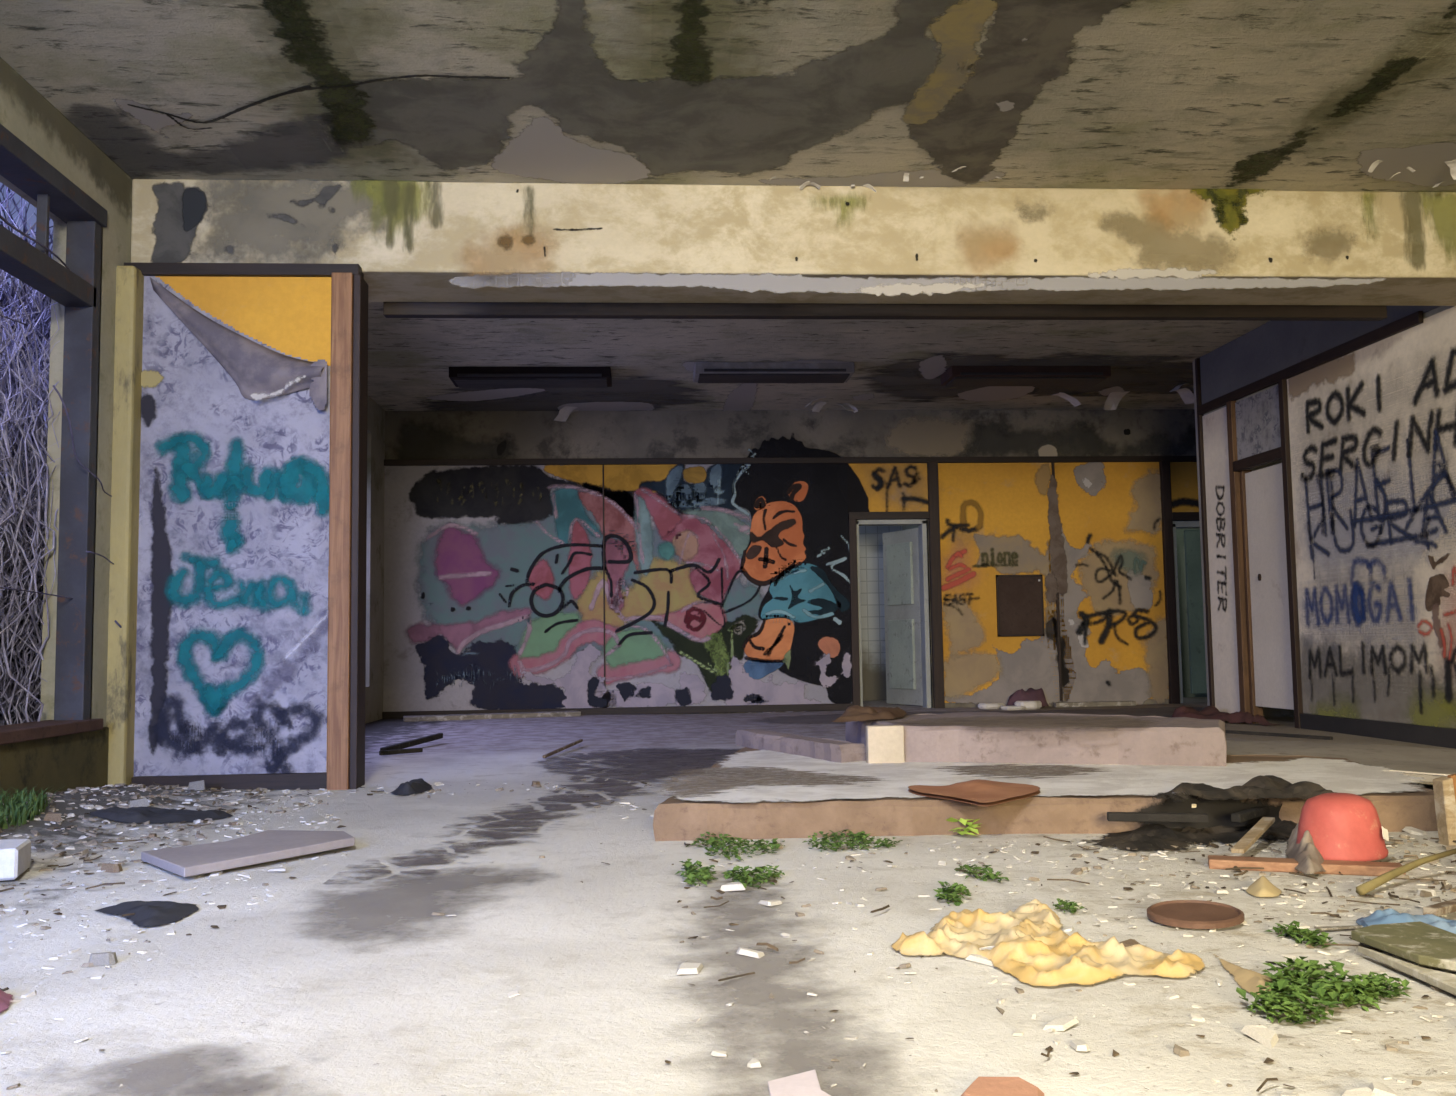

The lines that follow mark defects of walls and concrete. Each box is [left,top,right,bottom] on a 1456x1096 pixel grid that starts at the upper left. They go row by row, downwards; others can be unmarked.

water stain [0,0,1136,263]
water stain [1104,215,1232,270]
water stain [1310,233,1349,257]
water stain [1404,191,1456,268]
spalling [886,416,968,457]
spalling [1038,444,1058,456]
peeling [1073,462,1106,496]
peeling [942,473,1169,706]
water stain [613,749,739,777]
water stain [316,868,536,939]